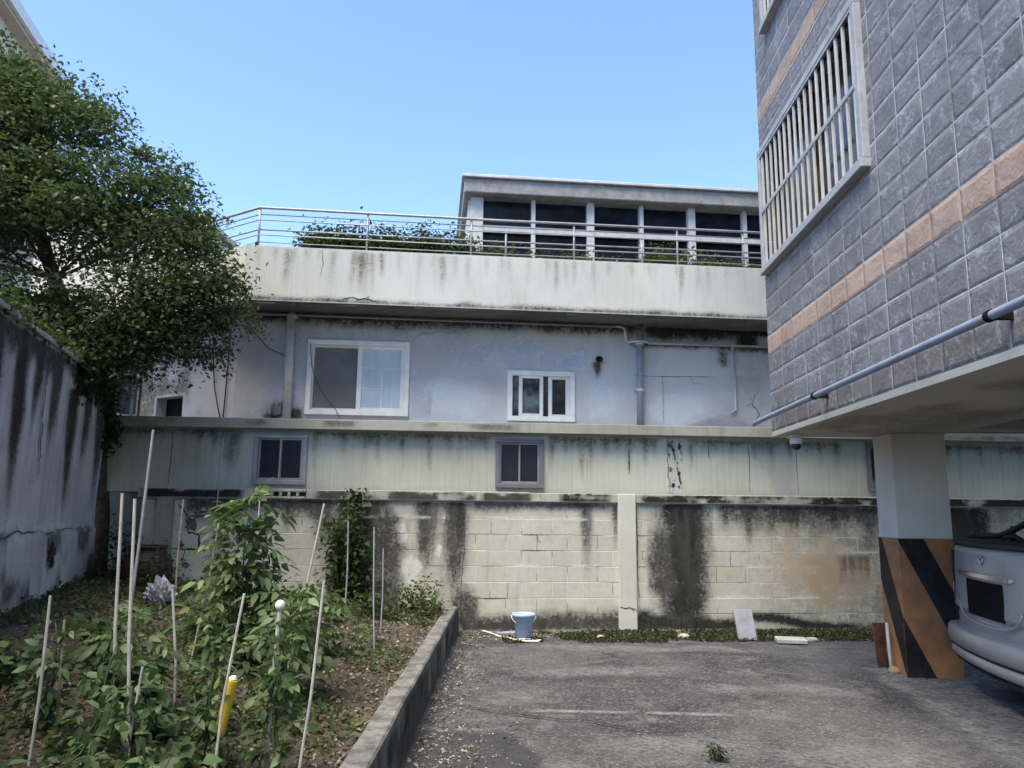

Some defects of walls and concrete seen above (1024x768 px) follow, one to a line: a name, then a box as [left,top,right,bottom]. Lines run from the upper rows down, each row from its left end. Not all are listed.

water stain [0,312,238,490]
water stain [320,432,485,446]
peeling [667,440,683,494]
crack [0,527,92,547]
water stain [79,526,94,574]
water stain [185,498,619,630]
water stain [637,440,878,629]